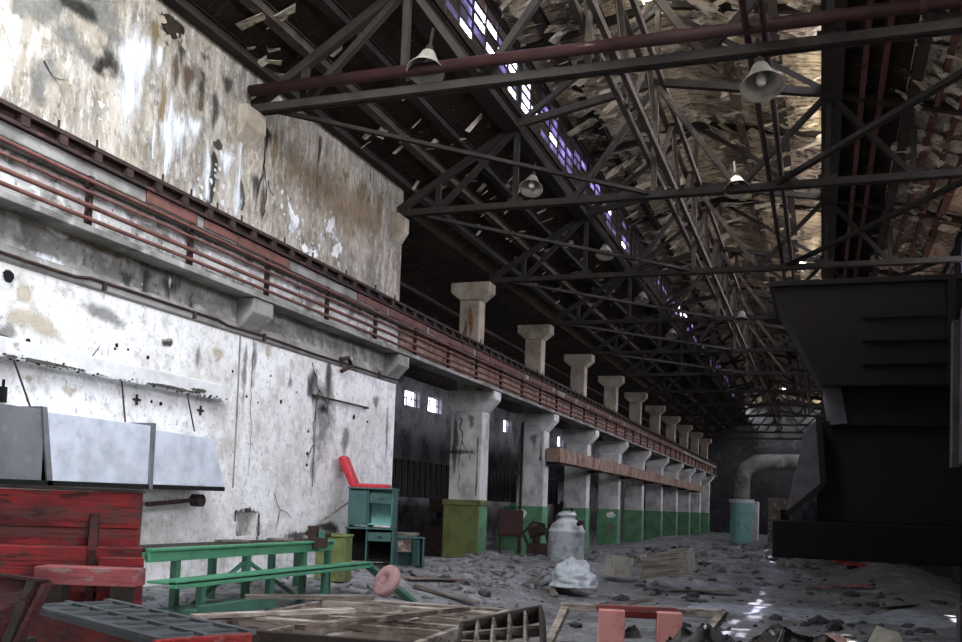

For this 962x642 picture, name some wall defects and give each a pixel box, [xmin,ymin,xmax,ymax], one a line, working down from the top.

leakage [0,0,242,215]
leakage [264,129,278,167]
leakage [252,177,266,215]
peeling [280,189,342,267]
leakage [311,363,332,401]